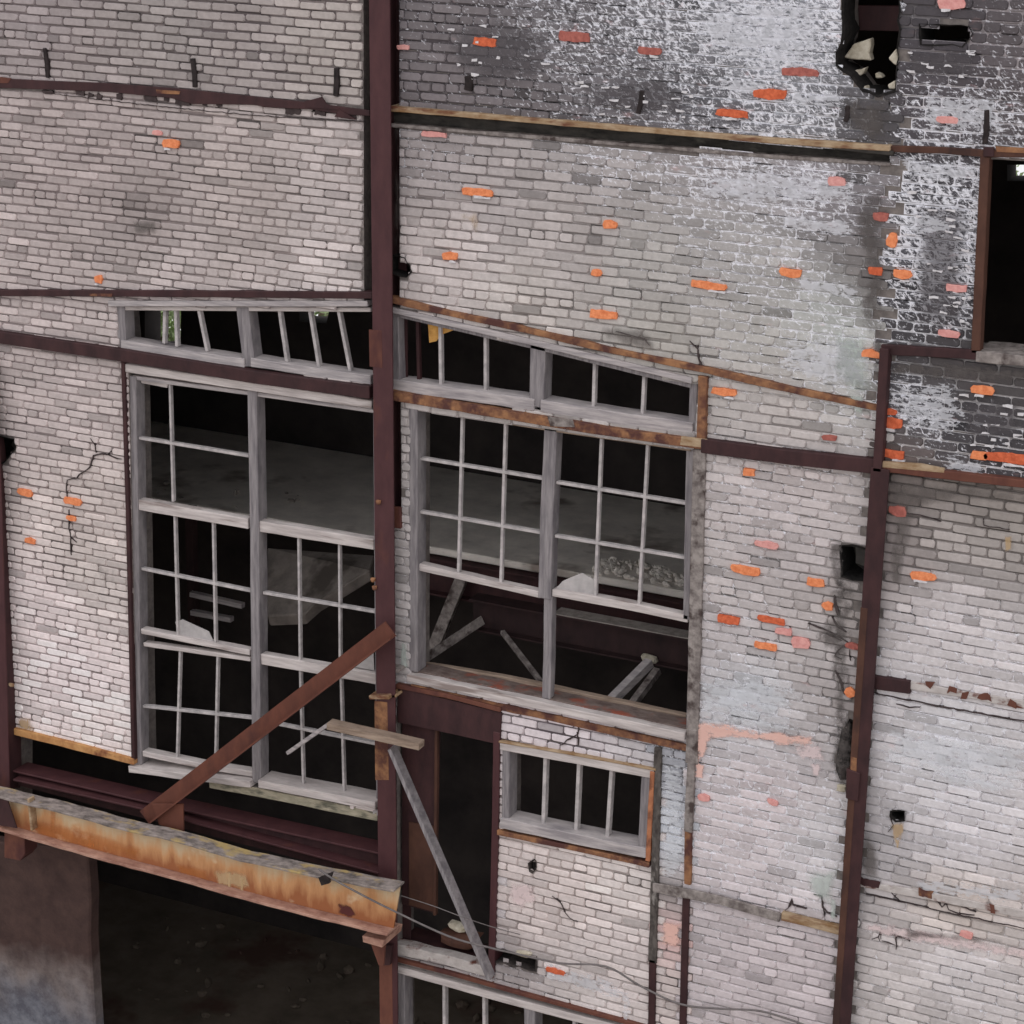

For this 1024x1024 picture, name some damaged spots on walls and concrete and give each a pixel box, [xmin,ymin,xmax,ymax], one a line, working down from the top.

peeling [447,24,550,79]
spalling [559,30,590,42]
spalling [835,0,976,98]
peeling [575,81,694,120]
spalling [886,408,903,432]
peeling [954,385,1024,468]
crack [66,438,121,555]
crack [808,622,851,661]
rust [947,686,992,702]
rust [338,904,355,917]
crack [865,893,1024,929]
crack [872,931,910,949]